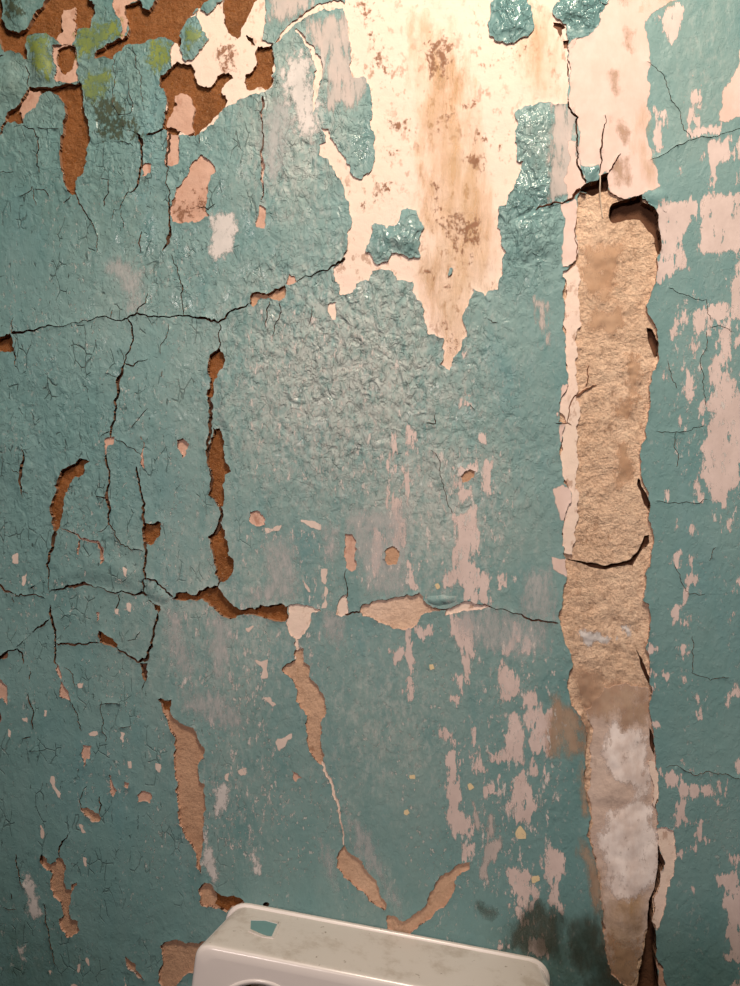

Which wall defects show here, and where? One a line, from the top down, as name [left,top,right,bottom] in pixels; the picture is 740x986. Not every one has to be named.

crack [275,0,346,111]
crack [647,61,740,160]
crack [297,257,345,281]
crack [0,46,282,752]
peeling [149,0,740,934]
crack [344,570,360,616]
crack [479,604,559,624]
spalling [637,758,740,986]
flaking render [158,939,205,986]